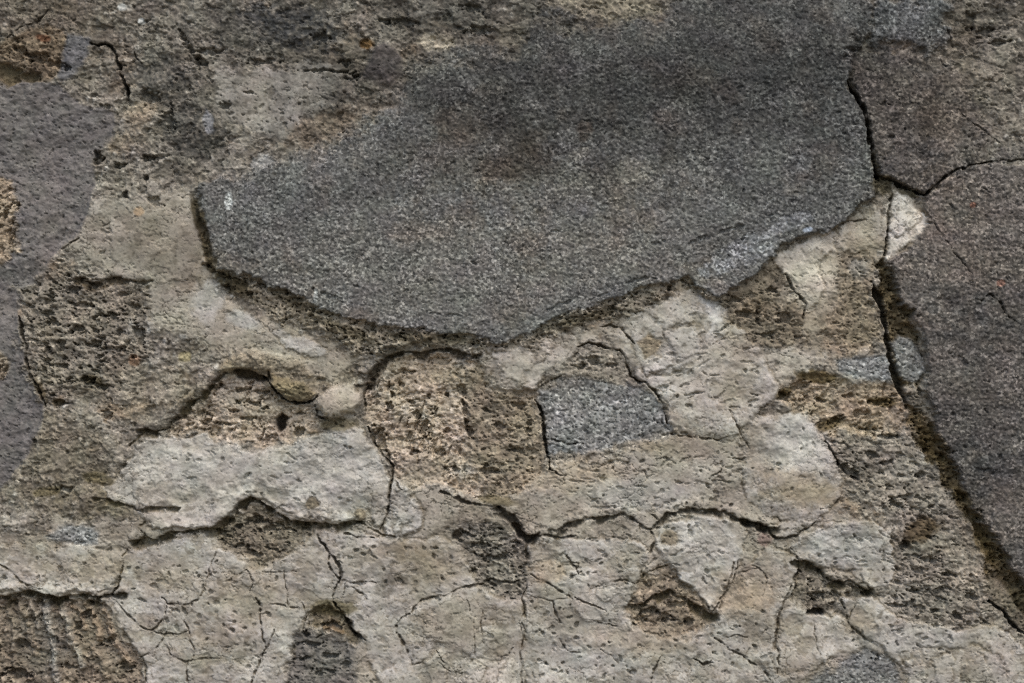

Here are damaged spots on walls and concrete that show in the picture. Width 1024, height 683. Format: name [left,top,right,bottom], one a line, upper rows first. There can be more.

spalling [0,260,154,405]
spalling [168,372,319,449]
spalling [202,259,719,391]
crack [534,375,585,477]
crack [577,322,750,450]
spalling [817,190,929,359]
crack [831,80,1024,491]
spalling [0,597,145,683]
crack [0,347,483,683]
crack [395,440,878,683]
spalling [779,379,996,629]
crack [964,510,1024,635]